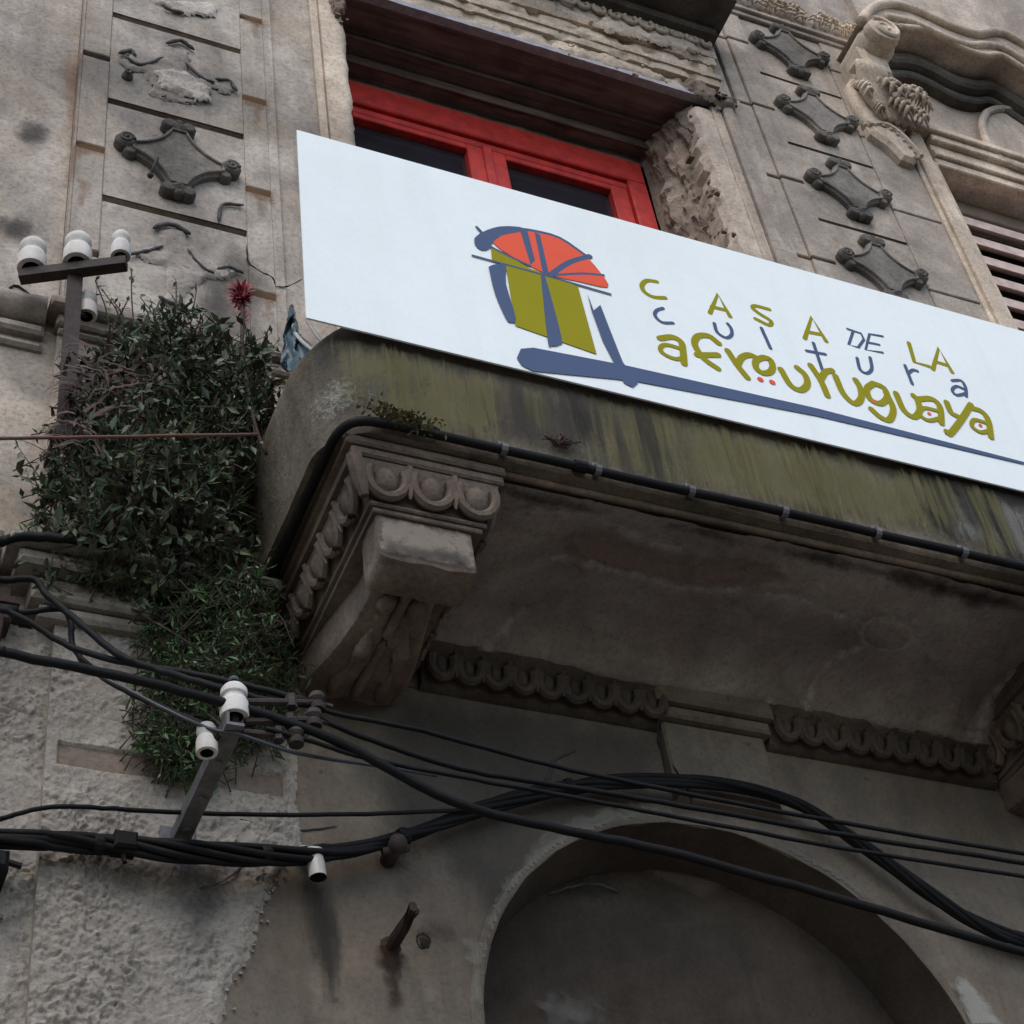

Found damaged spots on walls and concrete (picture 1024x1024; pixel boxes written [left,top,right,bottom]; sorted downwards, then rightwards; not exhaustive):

spalling [118,38,238,106]
crack [246,245,303,288]
damp [908,465,1024,556]
damp [382,521,473,567]
damp [891,573,1009,605]
corrosion [378,948,403,1003]